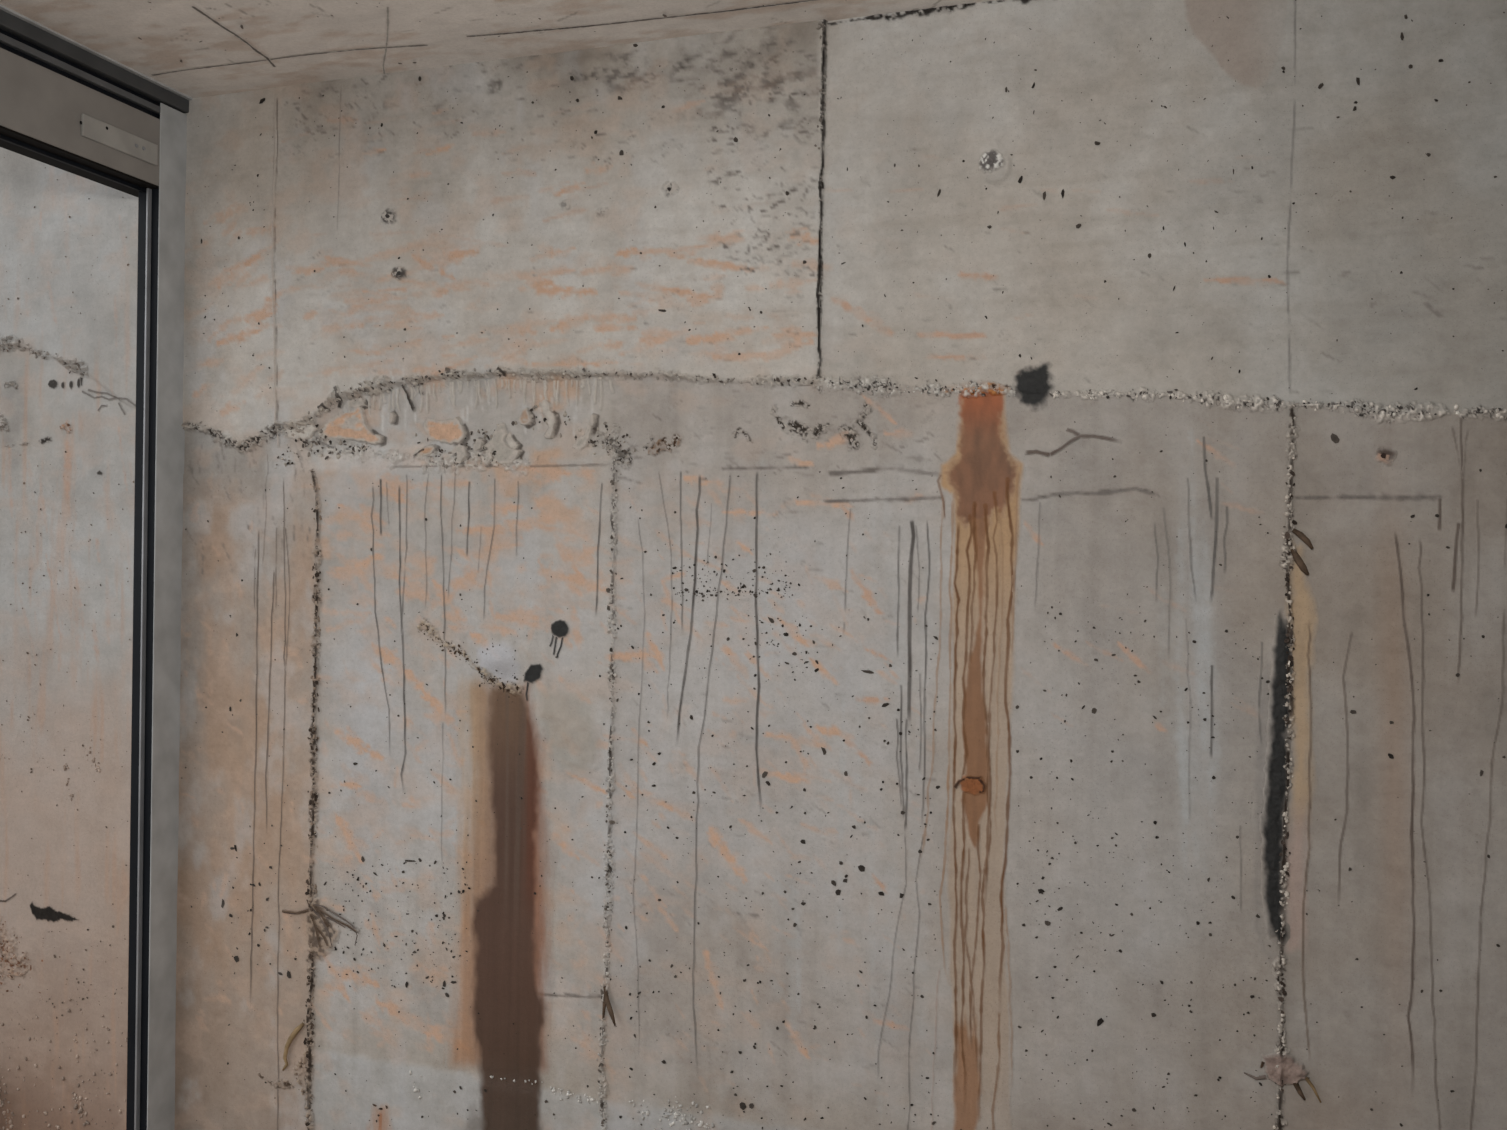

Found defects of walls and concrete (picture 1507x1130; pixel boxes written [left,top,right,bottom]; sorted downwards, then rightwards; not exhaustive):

crack [151,6,429,1130]
damp [370,469,559,1130]
crack [543,423,622,1130]
peeling [181,365,1016,479]
crack [466,0,1058,379]
crack [825,467,940,503]
rust [919,381,1025,1130]
crack [1027,487,1156,501]
spalling [1050,387,1507,426]
crack [1270,0,1437,1130]